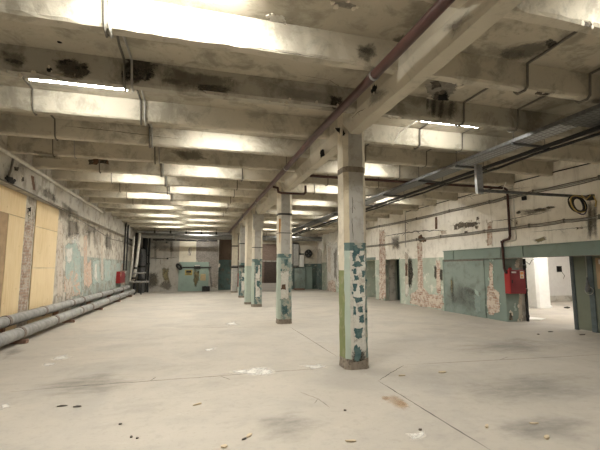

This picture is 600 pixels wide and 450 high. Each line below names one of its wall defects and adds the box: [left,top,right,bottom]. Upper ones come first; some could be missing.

water stain [56,59,89,79]
mould [122,59,156,84]
water stain [358,44,375,61]
water stain [502,39,556,59]
peeling [57,213,123,301]
peeling [280,259,290,315]
peeling [352,246,367,361]
flaking render [378,226,387,300]
flaking render [404,234,444,311]
flaking render [486,259,501,315]